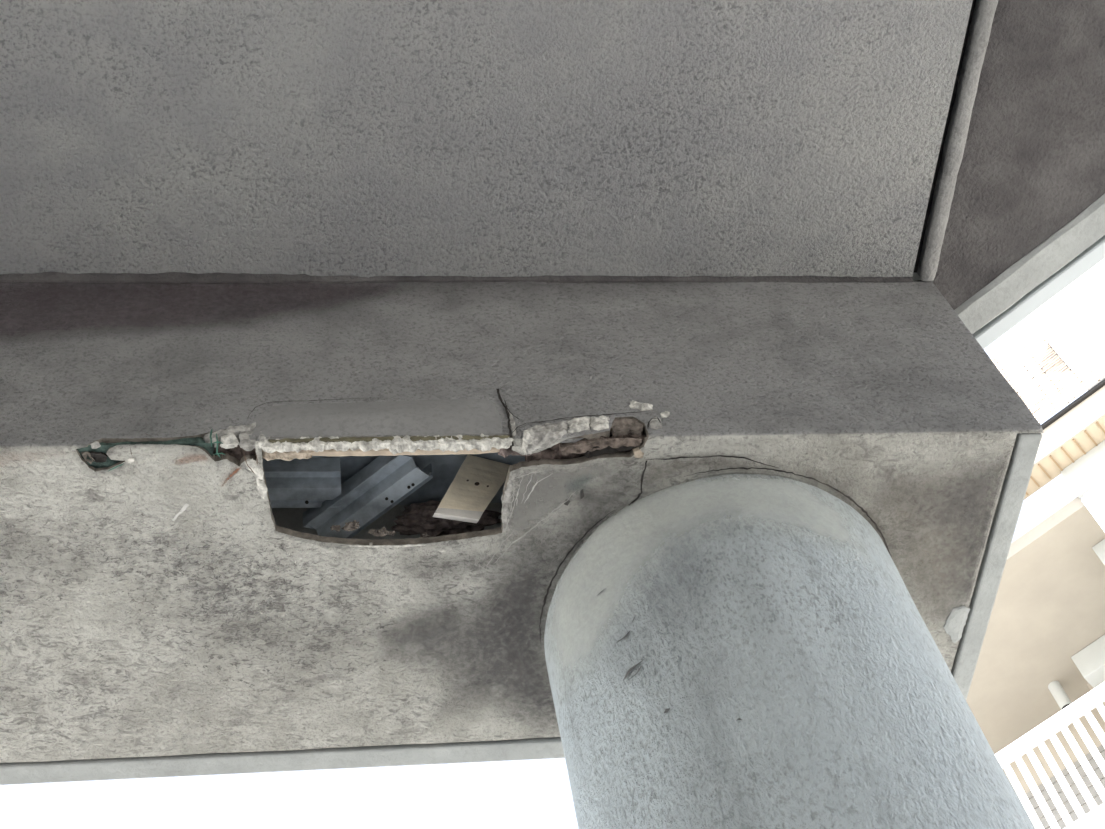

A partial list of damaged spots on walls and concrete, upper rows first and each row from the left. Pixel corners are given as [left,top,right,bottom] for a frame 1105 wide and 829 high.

crack [496,387,661,446]
spalling [77,401,670,499]
spalling [501,472,516,532]
spalling [330,520,447,552]
crack [539,455,891,644]